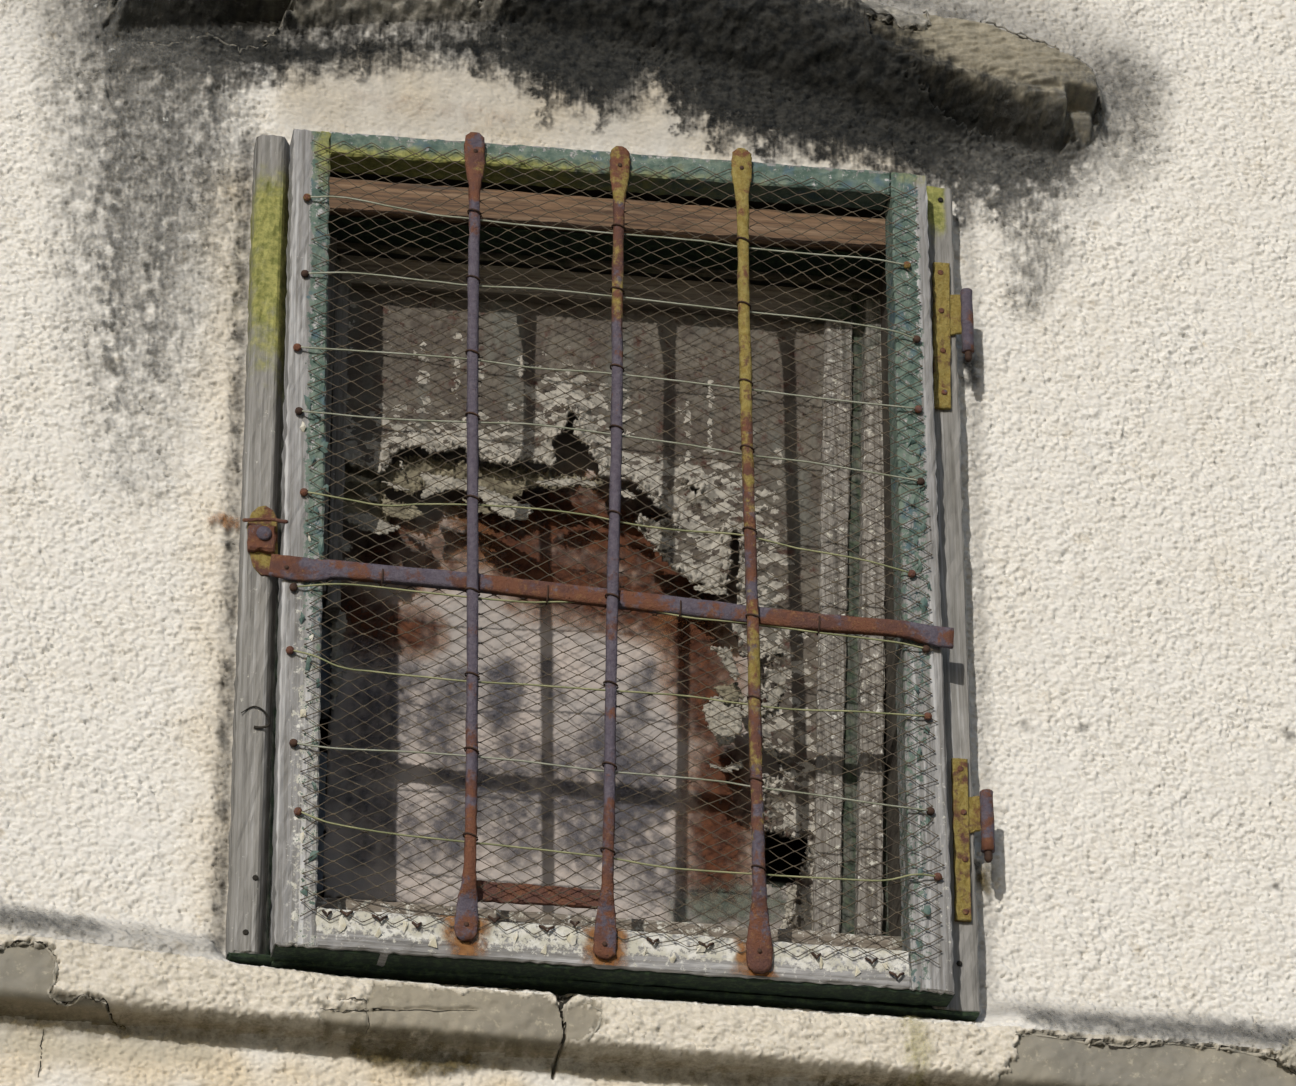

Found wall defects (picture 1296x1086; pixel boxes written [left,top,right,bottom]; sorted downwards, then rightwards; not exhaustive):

damp [49,0,1147,374]
peeling [342,460,534,552]
peeling [533,476,597,487]
peeling [635,521,673,551]
peeling [694,585,730,596]
peeling [299,612,320,688]
rust [442,915,488,956]
rust [583,927,627,966]
rust [736,939,776,977]
flaking render [0,940,125,1031]
crack [555,994,574,1063]
flaking render [996,1032,1296,1086]